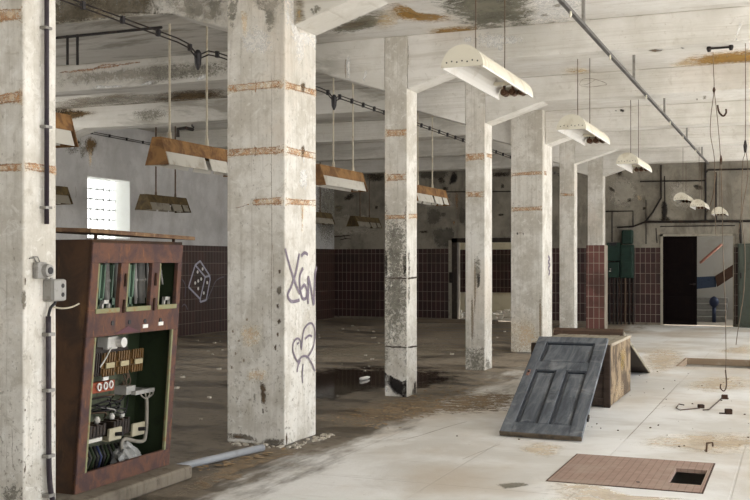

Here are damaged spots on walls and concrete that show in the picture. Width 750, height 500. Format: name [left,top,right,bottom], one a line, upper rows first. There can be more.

water stain [335,0,533,33]
water stain [55,62,228,120]
corrosion [229,80,316,96]
water stain [80,138,97,158]
corrosion [229,147,316,159]
water stain [316,203,410,363]